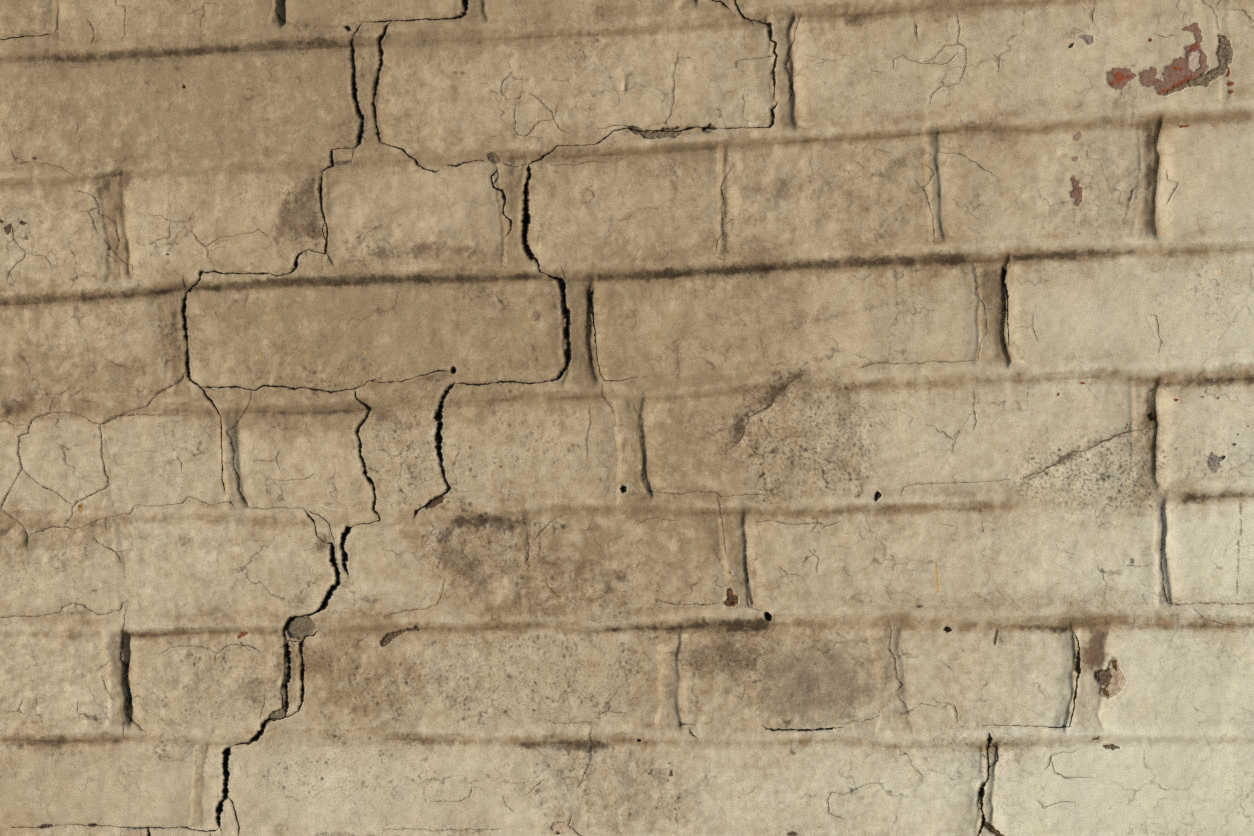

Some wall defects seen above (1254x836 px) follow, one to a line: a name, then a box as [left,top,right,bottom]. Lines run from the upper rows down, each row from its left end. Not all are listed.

peeling [1106,23,1234,96]
spalling [1094,657,1125,699]
crack [888,621,1095,836]